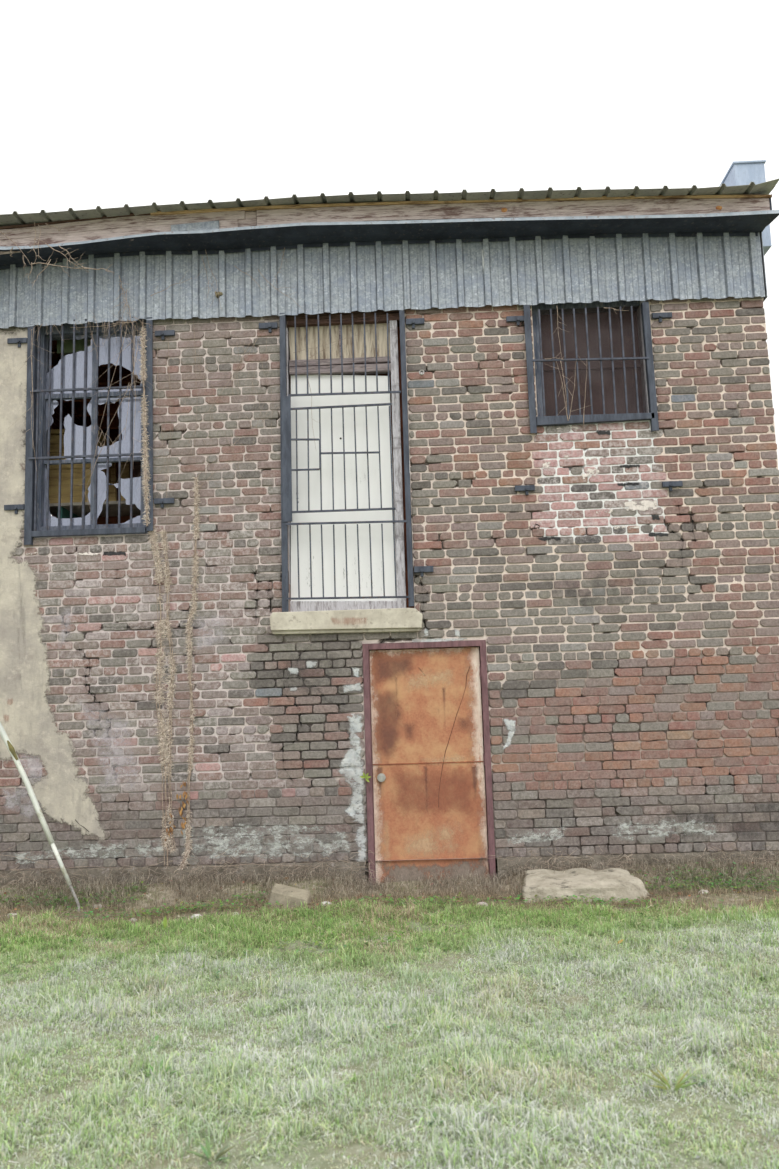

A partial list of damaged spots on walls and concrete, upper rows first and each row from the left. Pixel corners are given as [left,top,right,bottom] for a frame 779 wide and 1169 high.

peeling [0,327,106,842]
rust [370,647,487,883]
water stain [183,824,350,860]
water stain [512,829,565,844]
water stain [613,820,715,840]